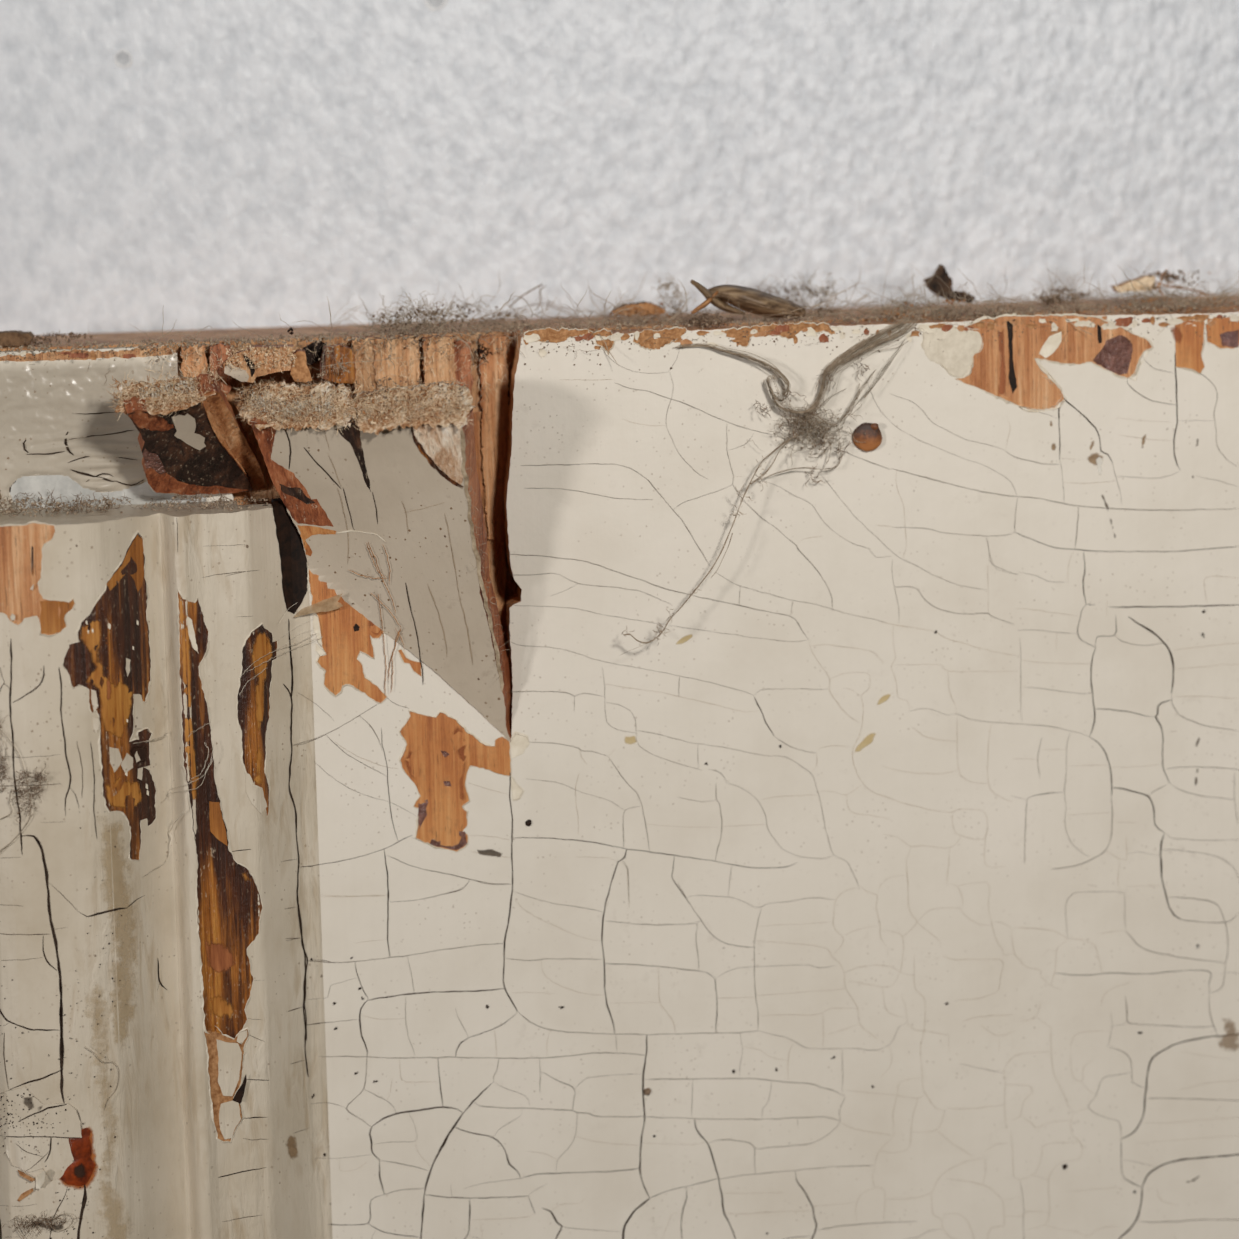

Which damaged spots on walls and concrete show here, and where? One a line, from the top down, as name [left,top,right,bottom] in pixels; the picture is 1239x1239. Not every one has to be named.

peeling [523,313,1239,412]
crack [202,544,257,578]
peeling [0,474,208,861]
peeling [236,622,278,817]
peeling [307,565,388,704]
peeling [397,648,422,677]
peeling [398,710,530,853]
crack [247,341,1239,1239]
crack [0,642,145,1171]
peeling [176,589,264,1144]
crack [0,1185,87,1239]
crack [218,1117,266,1178]